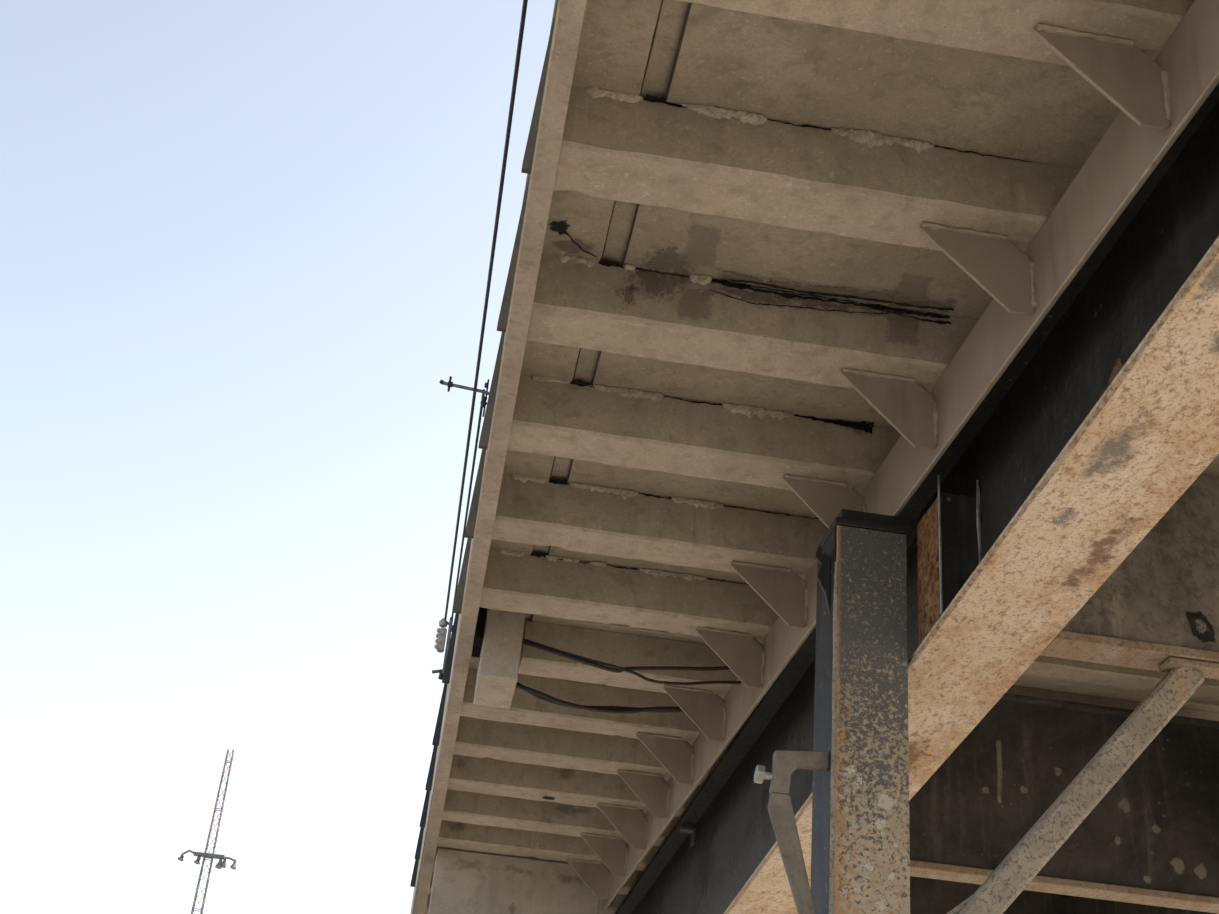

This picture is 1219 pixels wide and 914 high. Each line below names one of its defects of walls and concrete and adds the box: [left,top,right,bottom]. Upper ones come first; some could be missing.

crack [767,119,832,130]
crack [933,146,1032,162]
crack [549,220,596,257]
leakage [616,243,694,309]
crack [636,267,954,325]
crack [664,396,723,406]
crack [794,415,875,434]
corrosion [1064,518,1137,586]